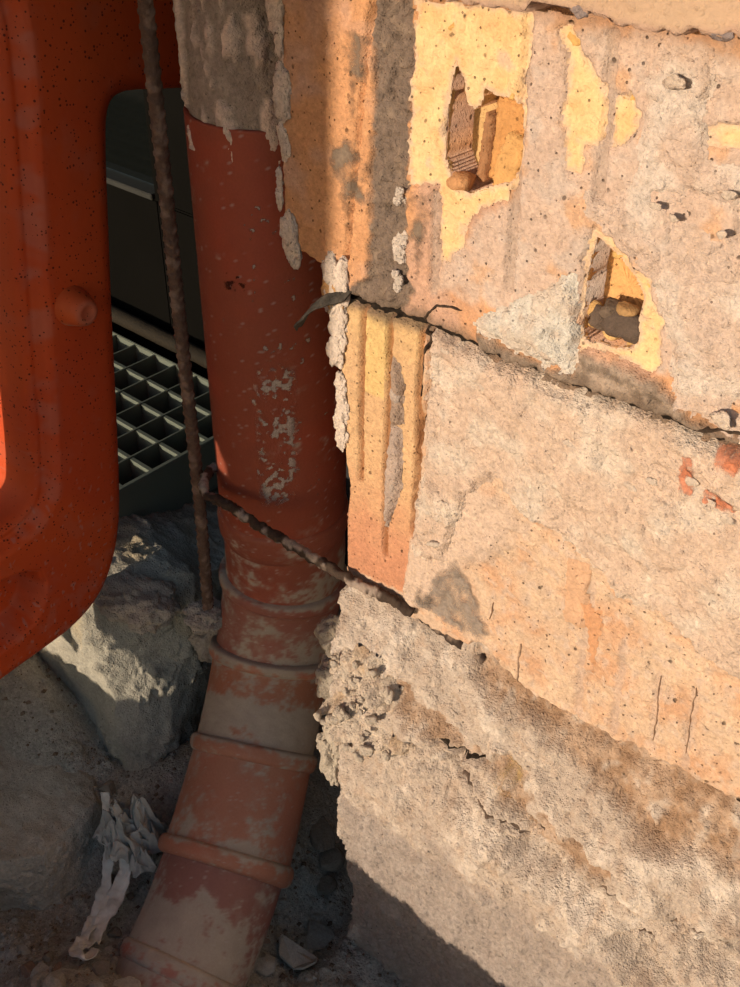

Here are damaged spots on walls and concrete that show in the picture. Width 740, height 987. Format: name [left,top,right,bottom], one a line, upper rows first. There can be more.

peeling [682,29,739,42]
peeling [265,0,298,256]
spalling [395,0,642,263]
peeling [321,251,351,353]
peeling [391,230,409,286]
spalling [579,226,665,373]
peeling [333,370,350,444]
crack [350,294,538,422]
crack [571,384,740,445]
spalling [313,643,414,763]
crack [439,738,545,835]
crack [638,918,704,938]